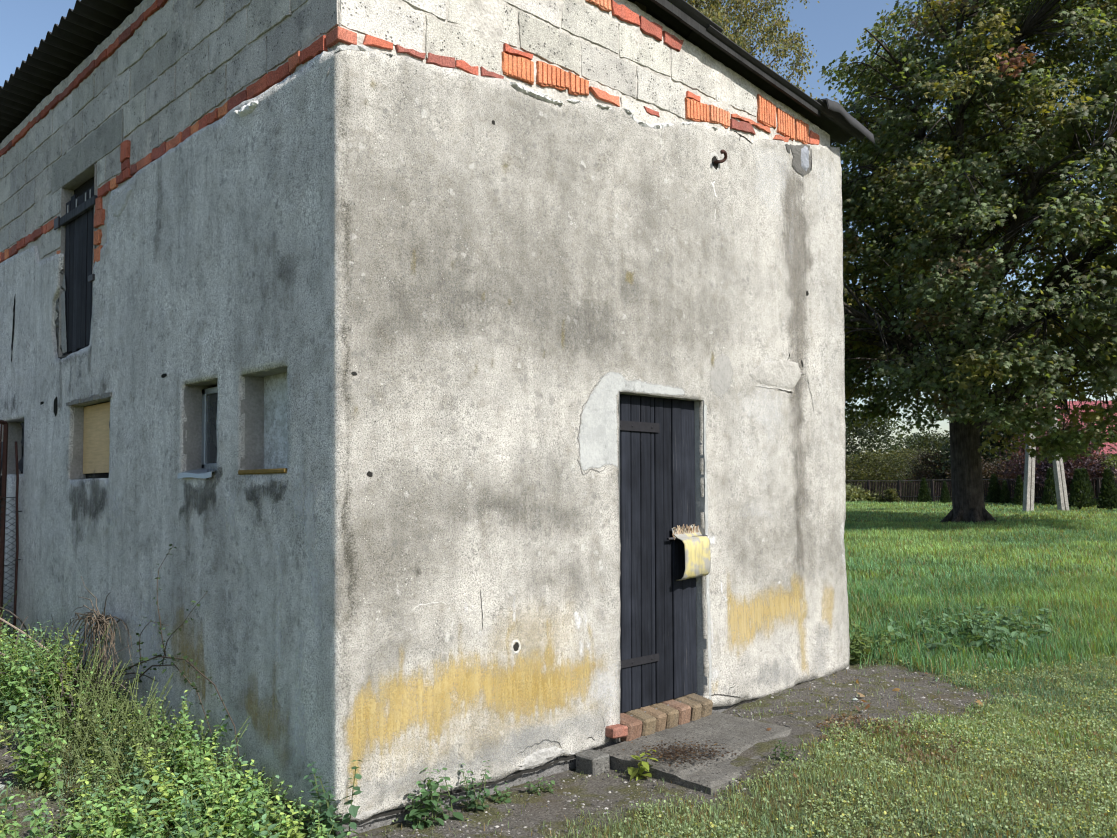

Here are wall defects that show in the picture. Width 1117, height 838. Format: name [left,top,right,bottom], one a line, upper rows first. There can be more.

spalling [334,44,394,57]
spalling [234,99,259,117]
spalling [510,81,693,129]
water stain [784,165,811,562]
water stain [180,468,222,515]
water stain [246,483,285,503]
water stain [707,582,805,644]
water stain [349,647,594,779]